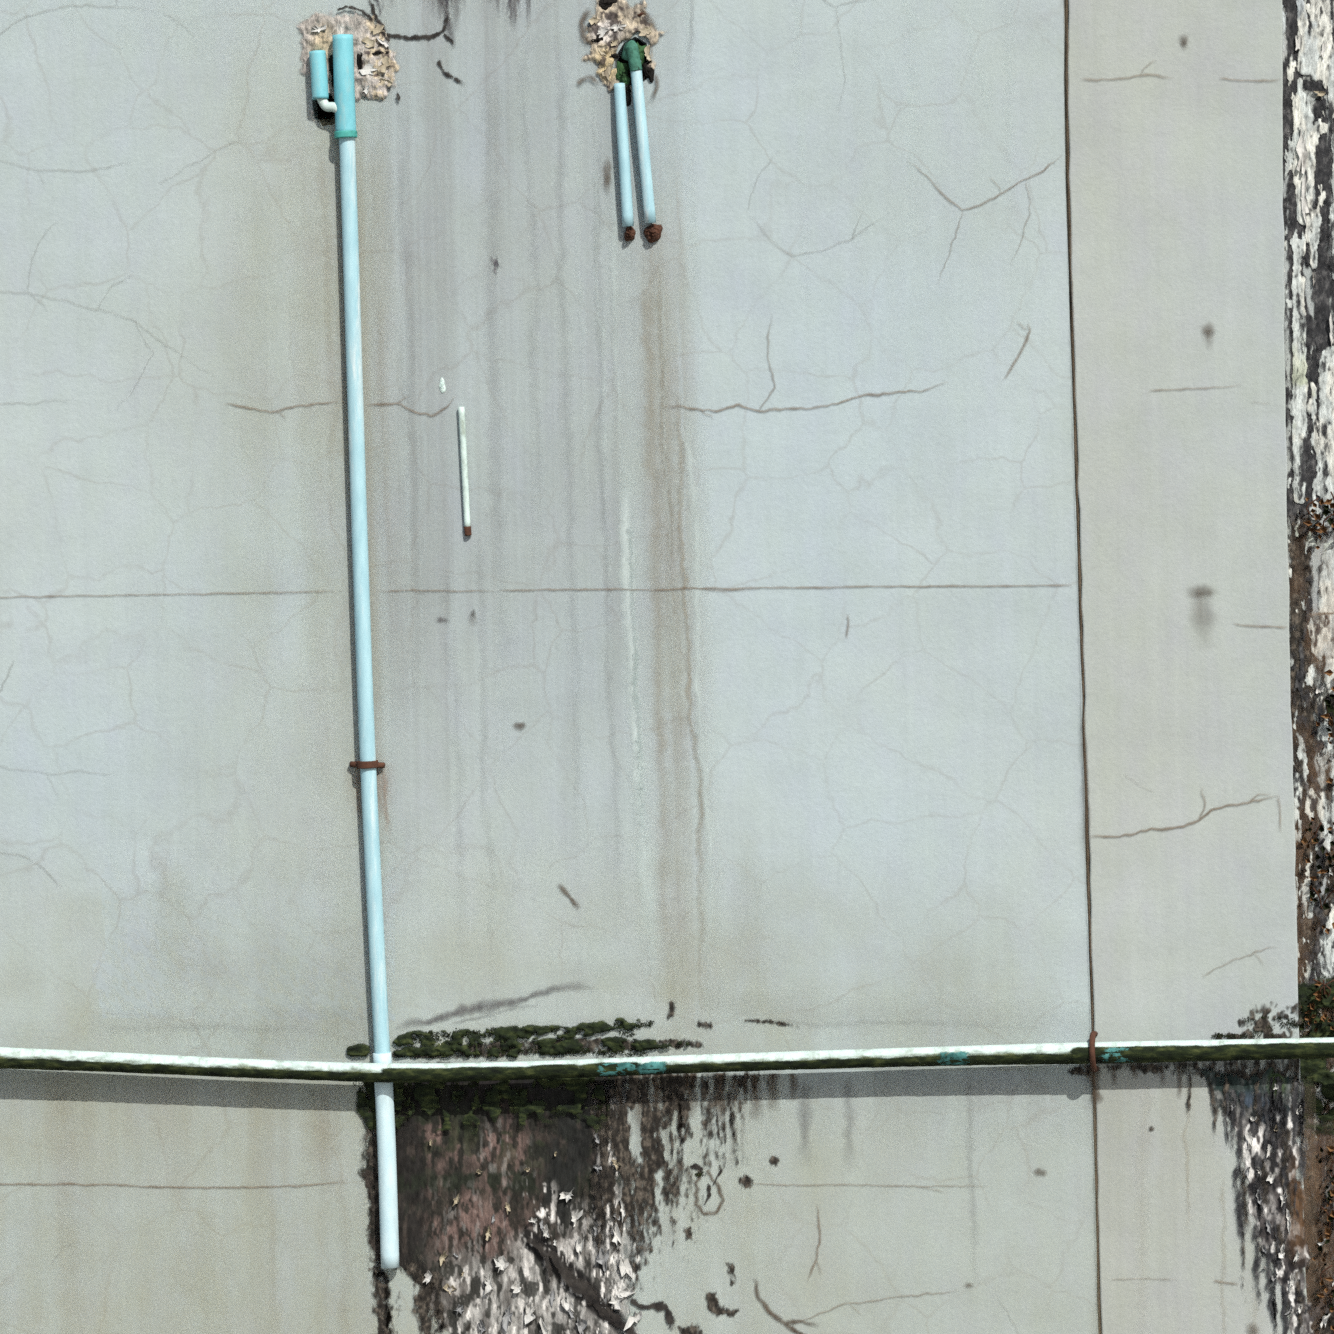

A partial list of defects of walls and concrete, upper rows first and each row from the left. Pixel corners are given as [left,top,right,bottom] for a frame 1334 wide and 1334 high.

spalling [297,5,401,101]
spalling [578,0,664,106]
crack [688,390,913,412]
leakage [1282,0,1334,987]
peeling [1282,0,1334,987]
crack [1102,800,1260,837]
leakage [391,1037,702,1059]
crack [1090,1071,1100,1098]
spalling [358,1076,656,1334]
leakage [591,1072,796,1289]
leakage [1068,1058,1334,1334]
crack [755,1284,809,1334]